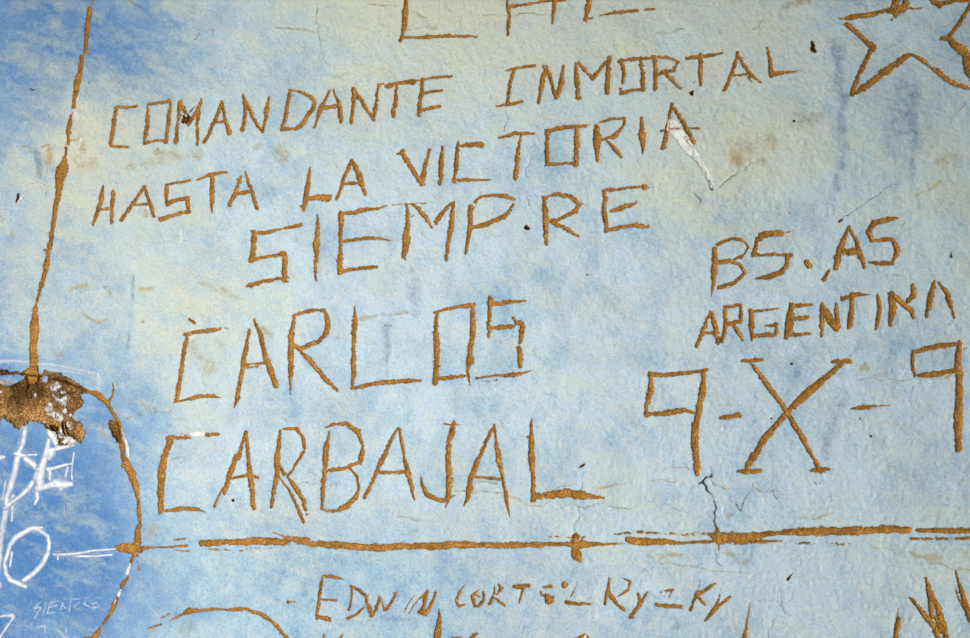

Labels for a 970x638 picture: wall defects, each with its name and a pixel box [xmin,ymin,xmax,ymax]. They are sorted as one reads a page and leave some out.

spalling [0,366,87,448]
crack [699,469,778,566]